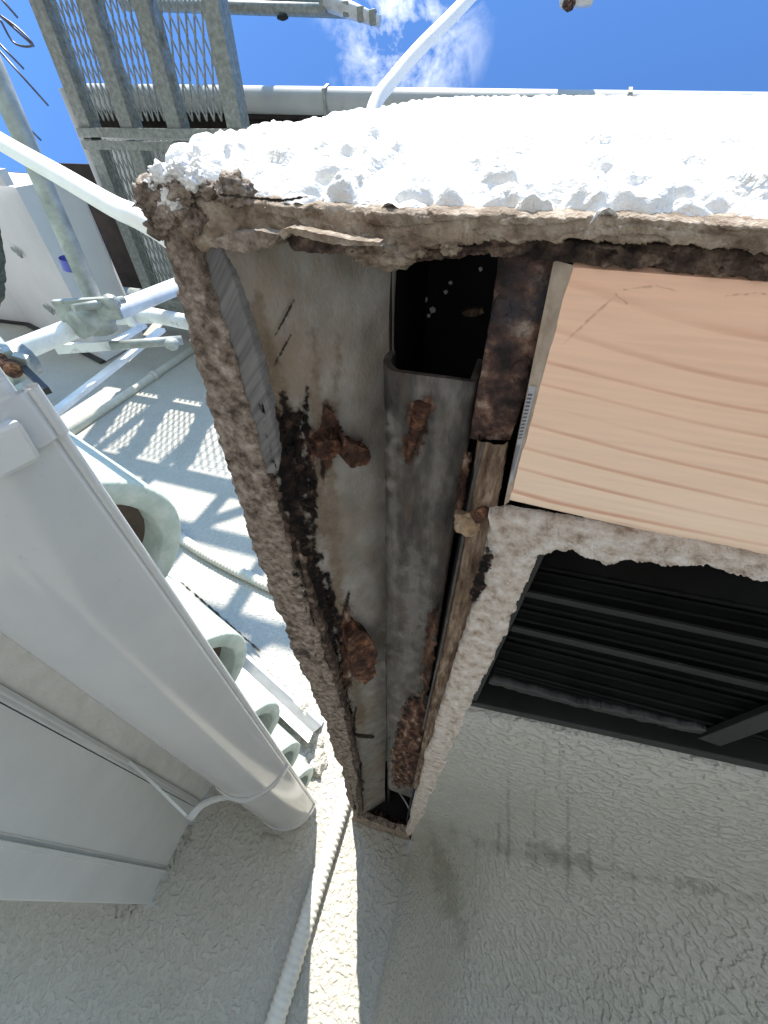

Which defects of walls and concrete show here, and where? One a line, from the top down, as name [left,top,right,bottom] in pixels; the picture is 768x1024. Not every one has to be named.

crack [220,193,308,202]
spalling [132,156,463,372]
rust [307,400,371,480]
rust [339,603,378,700]
rust [389,604,440,789]